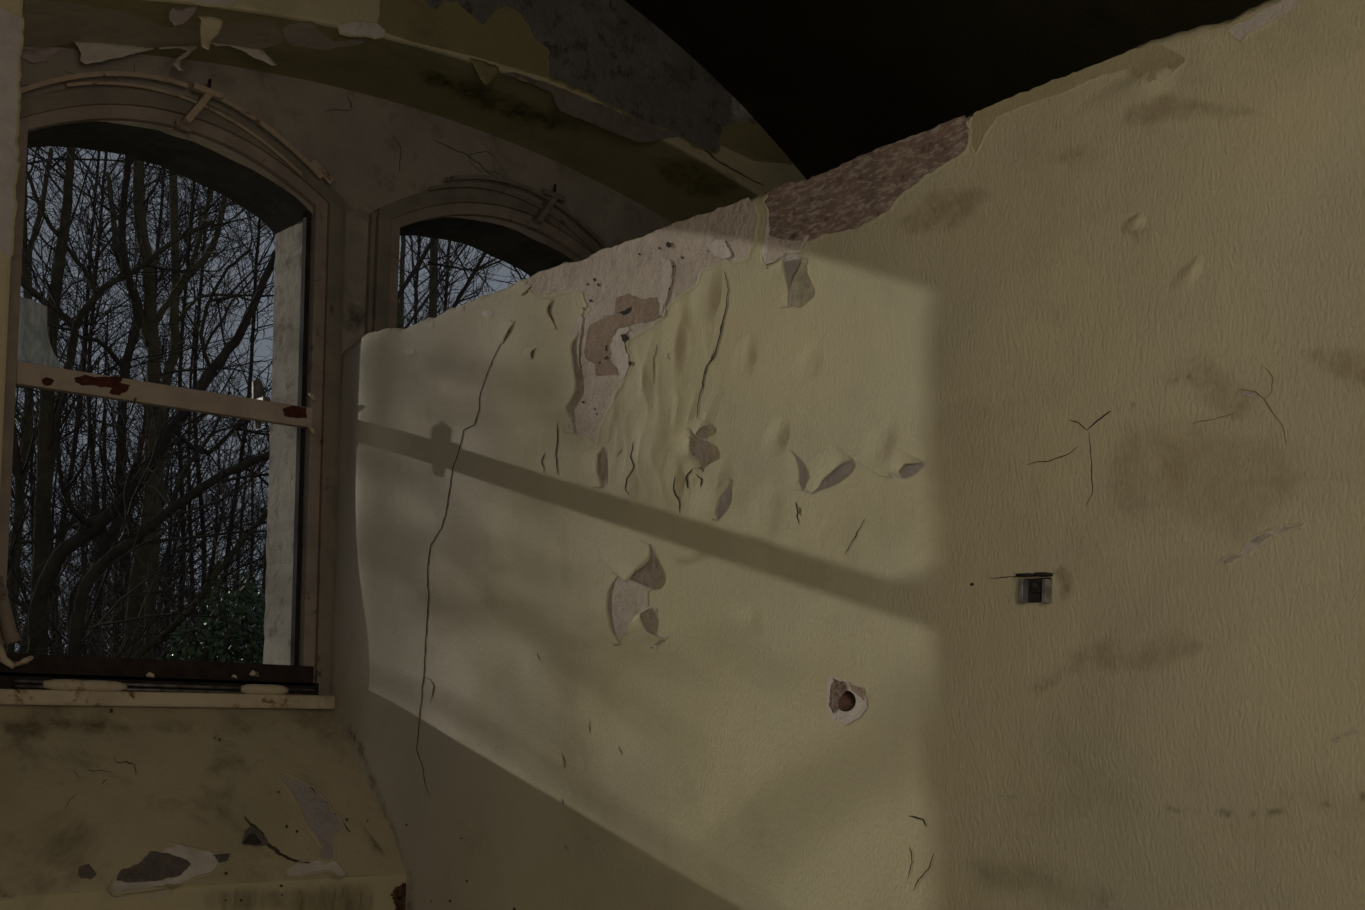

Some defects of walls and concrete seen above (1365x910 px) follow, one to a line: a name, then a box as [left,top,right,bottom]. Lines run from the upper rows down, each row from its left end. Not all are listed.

flaking render [0,0,386,260]
flaking render [423,0,758,154]
flaking render [512,42,1188,494]
crack [1027,411,1110,505]
crack [416,321,514,797]
peeling [598,540,651,581]
spalling [829,678,847,713]
spalling [76,839,232,896]